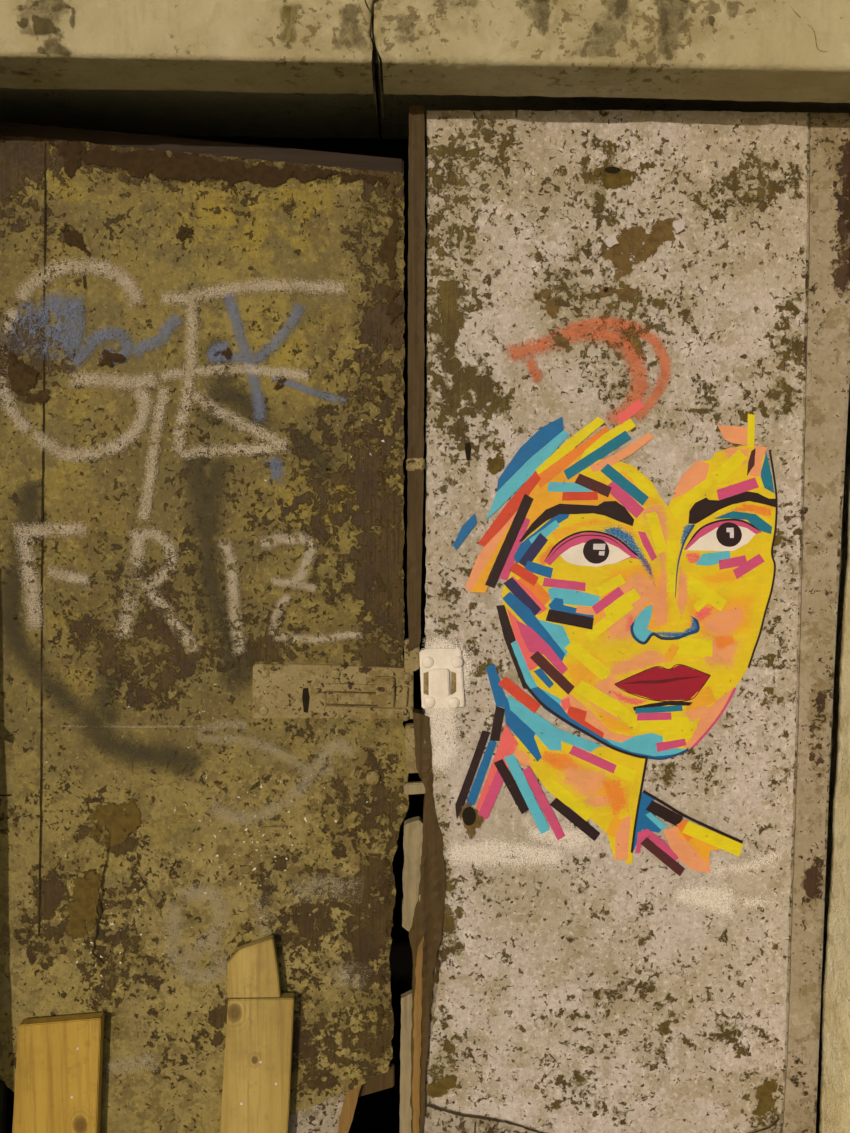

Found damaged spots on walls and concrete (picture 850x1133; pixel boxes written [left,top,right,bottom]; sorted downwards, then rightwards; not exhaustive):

spalling [17,0,75,35]
crack [364,0,381,63]